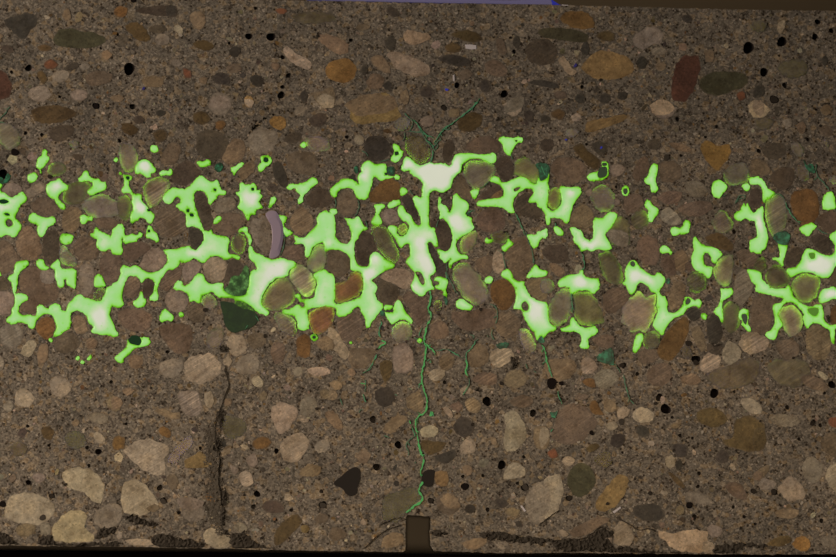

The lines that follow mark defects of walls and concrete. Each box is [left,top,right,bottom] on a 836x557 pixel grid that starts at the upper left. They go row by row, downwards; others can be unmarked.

crack [403,98,480,163]
crack [215,366,229,507]
crack [364,263,498,548]